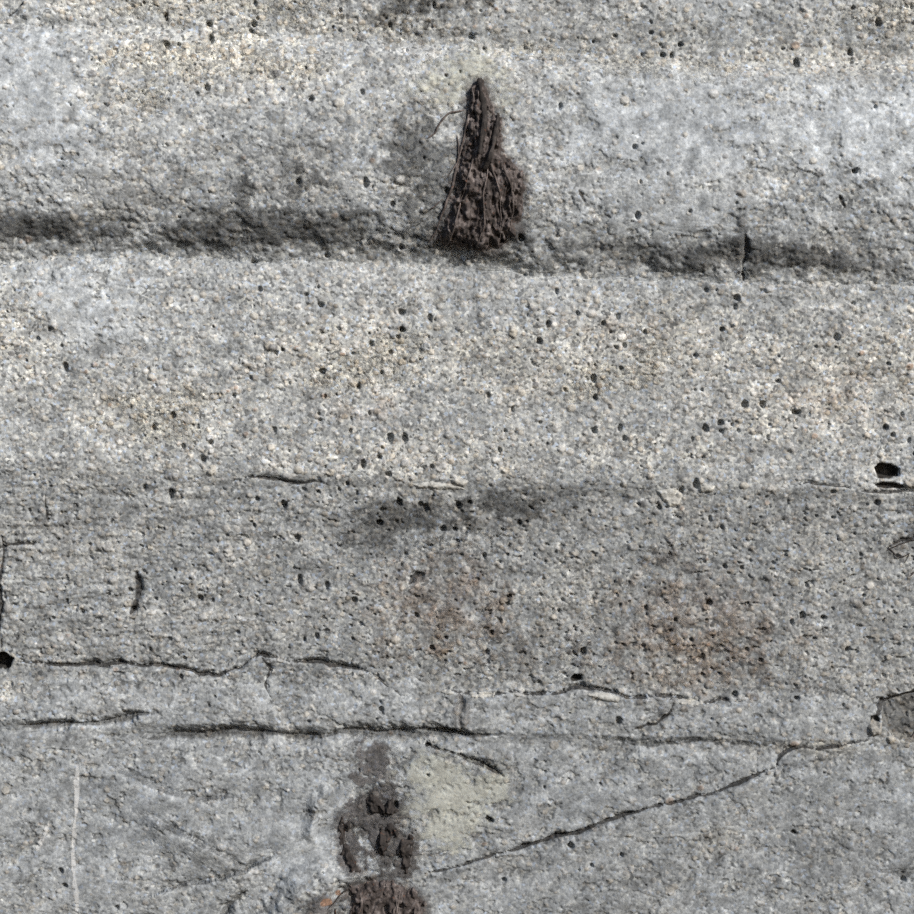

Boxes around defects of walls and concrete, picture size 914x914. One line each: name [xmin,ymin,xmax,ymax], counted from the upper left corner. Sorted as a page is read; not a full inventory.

damp [379,0,445,27]
damp [408,48,512,113]
damp [383,115,458,252]
crack [781,481,911,494]
crack [886,536,914,548]
crack [0,535,401,697]
crack [440,684,741,729]
crack [876,689,914,716]
spalling [881,691,914,742]
crack [425,739,869,874]